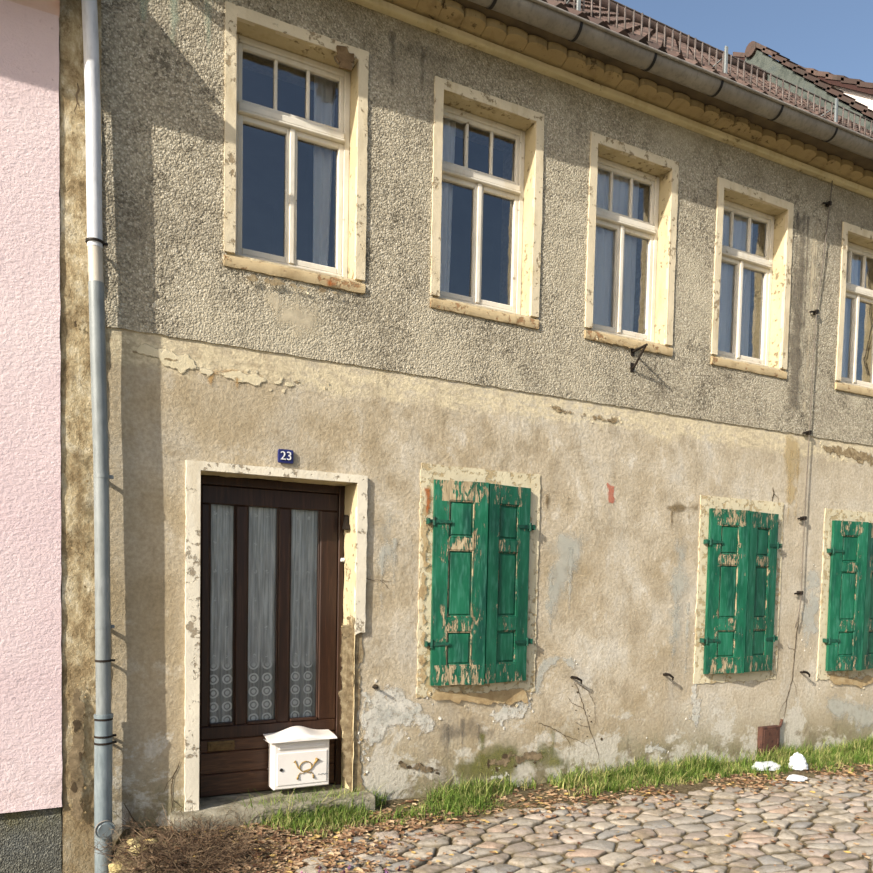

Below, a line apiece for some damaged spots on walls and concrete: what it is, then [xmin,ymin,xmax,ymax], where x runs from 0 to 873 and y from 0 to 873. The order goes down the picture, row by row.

peeling [126,340,300,393]
flaking render [550,405,622,423]
flaking render [820,443,873,466]
flaking render [338,515,577,792]